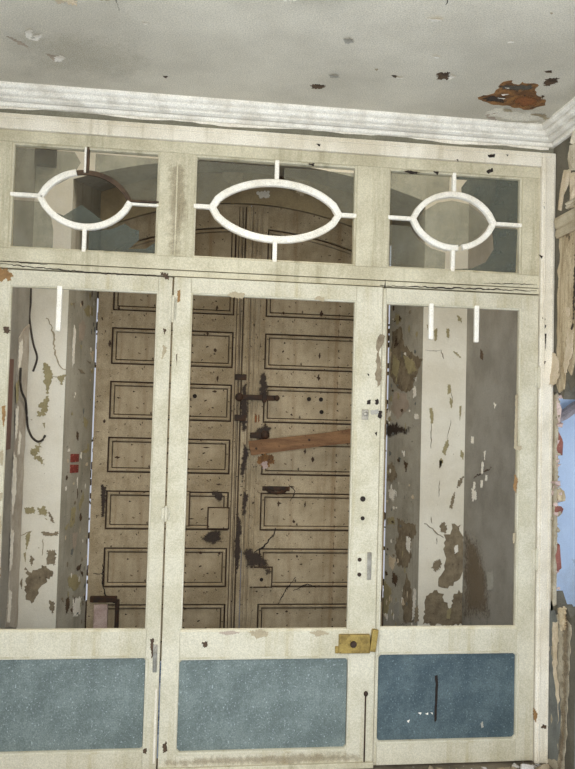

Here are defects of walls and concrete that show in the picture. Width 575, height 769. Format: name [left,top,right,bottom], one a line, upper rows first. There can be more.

corrosion [478,80,546,110]
peeling [70,291,96,381]
peeling [367,306,450,436]
peeling [0,324,87,628]
spalling [383,451,463,626]
spalling [533,231,575,769]